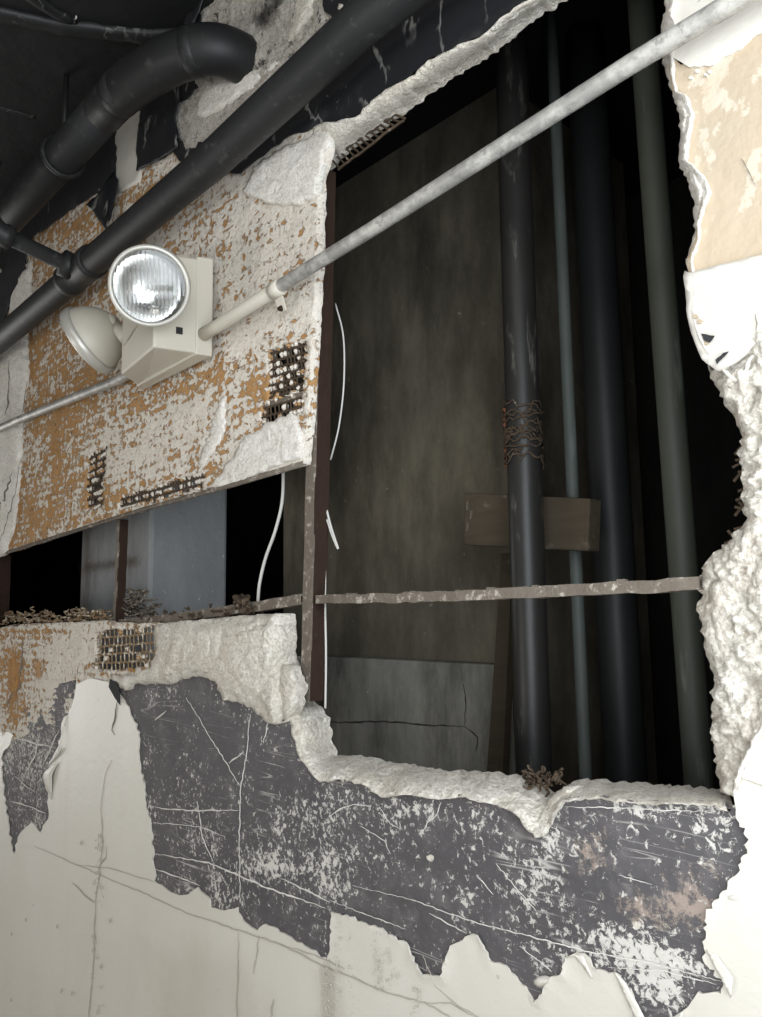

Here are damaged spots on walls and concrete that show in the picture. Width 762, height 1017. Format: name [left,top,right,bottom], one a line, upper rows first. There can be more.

flaking render [26,255,56,294]
flaking render [32,0,343,254]
flaking render [139,0,568,321]
flaking render [661,0,677,33]
flaking render [8,267,325,552]
flaking render [662,34,762,797]
crack [34,760,478,1017]
peeling [0,613,749,1017]
crack [332,684,478,751]